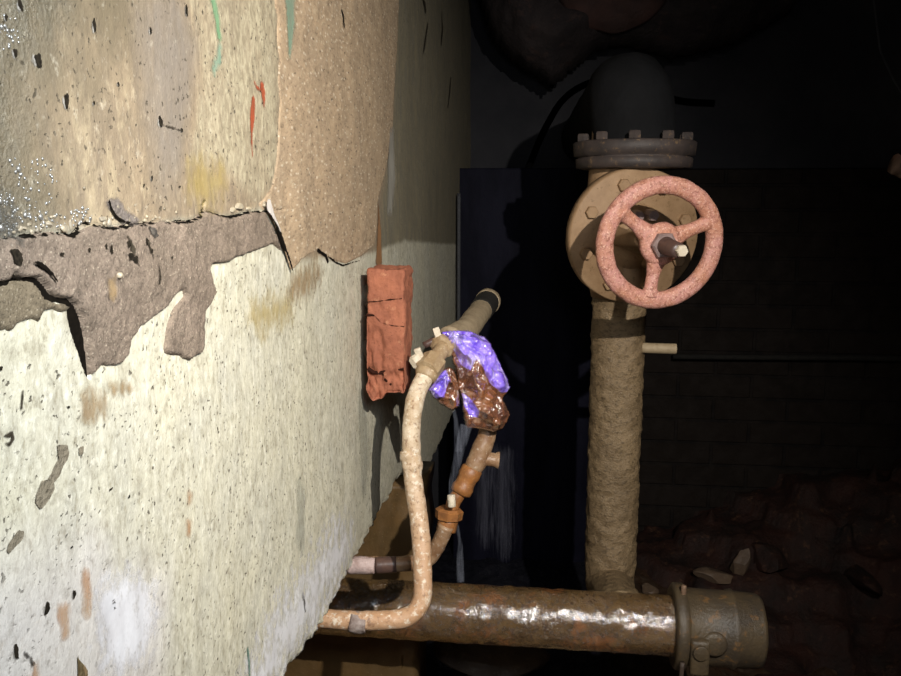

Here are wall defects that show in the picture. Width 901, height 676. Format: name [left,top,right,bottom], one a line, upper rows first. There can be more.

spalling [0,198,281,375]
peeling [35,445,84,509]